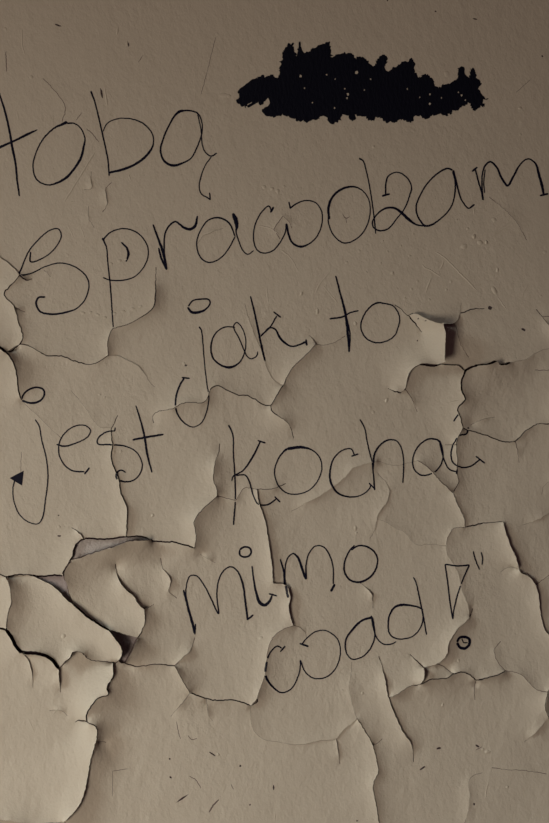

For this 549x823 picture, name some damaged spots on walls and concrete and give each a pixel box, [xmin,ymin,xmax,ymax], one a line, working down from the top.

crack [0,257,156,438]
crack [0,392,382,823]
crack [152,305,345,438]
peeling [0,255,549,823]
crack [292,308,549,546]
crack [379,641,549,762]